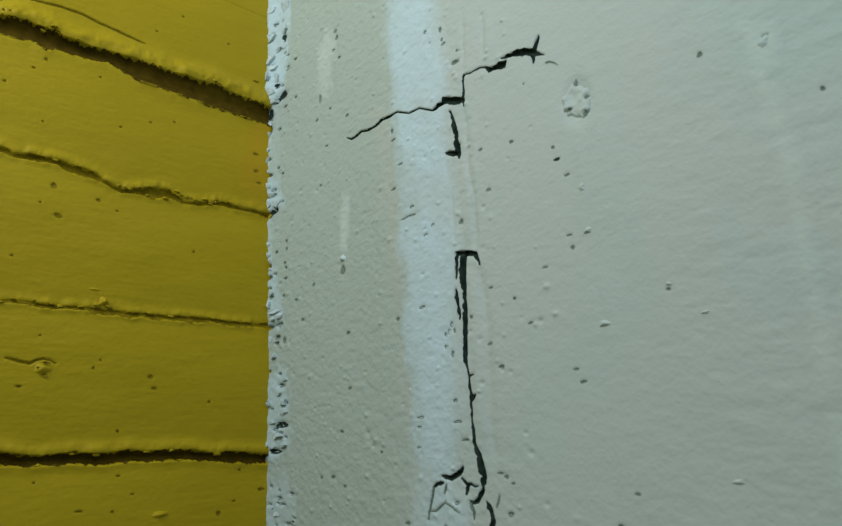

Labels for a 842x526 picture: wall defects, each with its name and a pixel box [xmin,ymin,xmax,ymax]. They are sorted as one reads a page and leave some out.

crack [0,0,271,127]
crack [347,35,557,159]
crack [0,148,269,218]
crack [0,298,271,328]
crack [428,250,500,526]
crack [0,449,268,467]